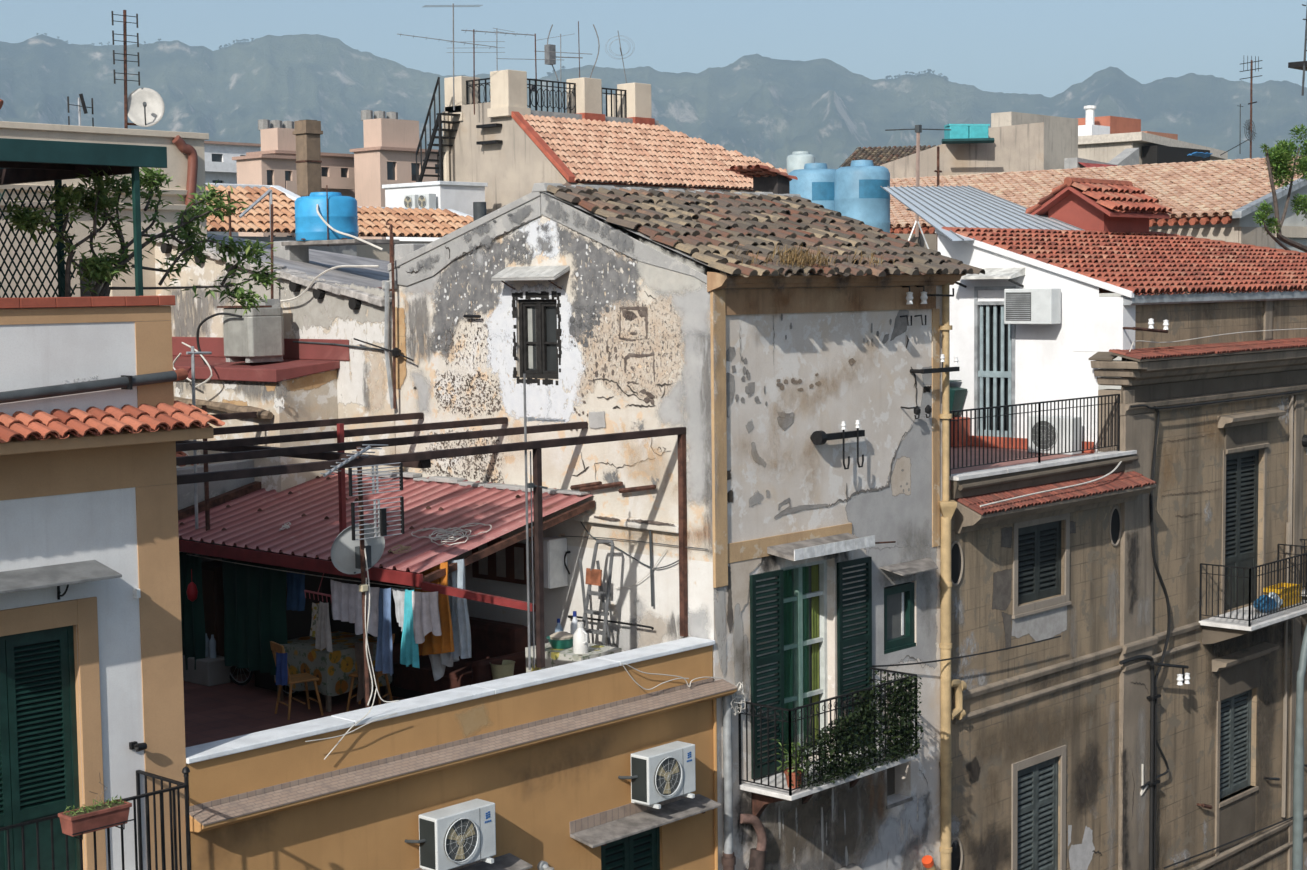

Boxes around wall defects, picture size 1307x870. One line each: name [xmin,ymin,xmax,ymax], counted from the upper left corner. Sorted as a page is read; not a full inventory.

flaking render [175,381,205,397]
peeling [222,307,416,409]
peeling [420,205,683,483]
crack [572,378,672,480]
flaking render [746,420,766,467]
flaking render [726,347,821,430]
peeling [861,796,930,870]
damp [1076,716,1163,870]